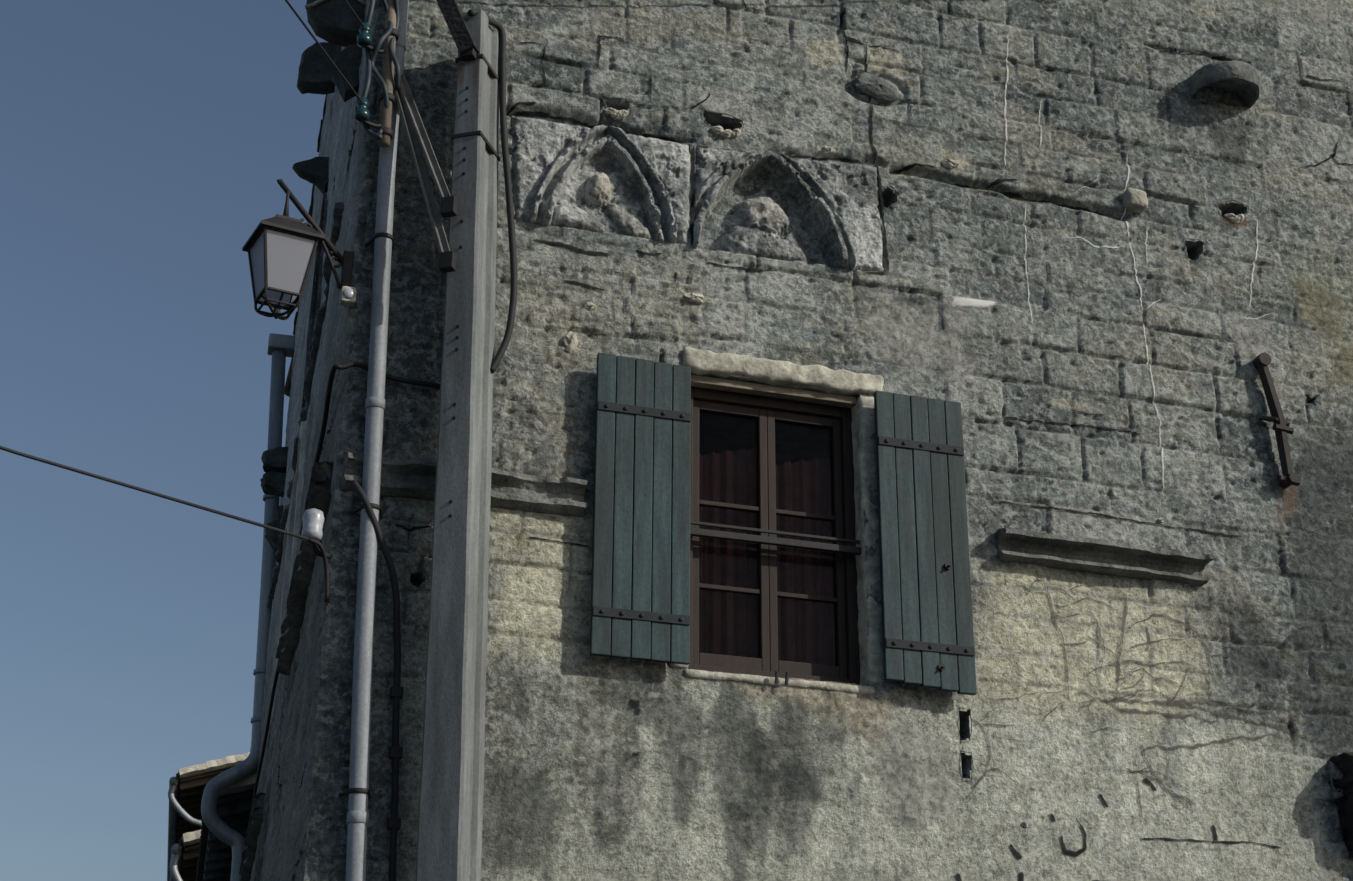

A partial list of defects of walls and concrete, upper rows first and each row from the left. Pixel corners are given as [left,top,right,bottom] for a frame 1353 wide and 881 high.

crack [789,7,1104,275]
crack [1300,140,1353,168]
crack [275,681,307,881]
crack [1142,838,1281,848]